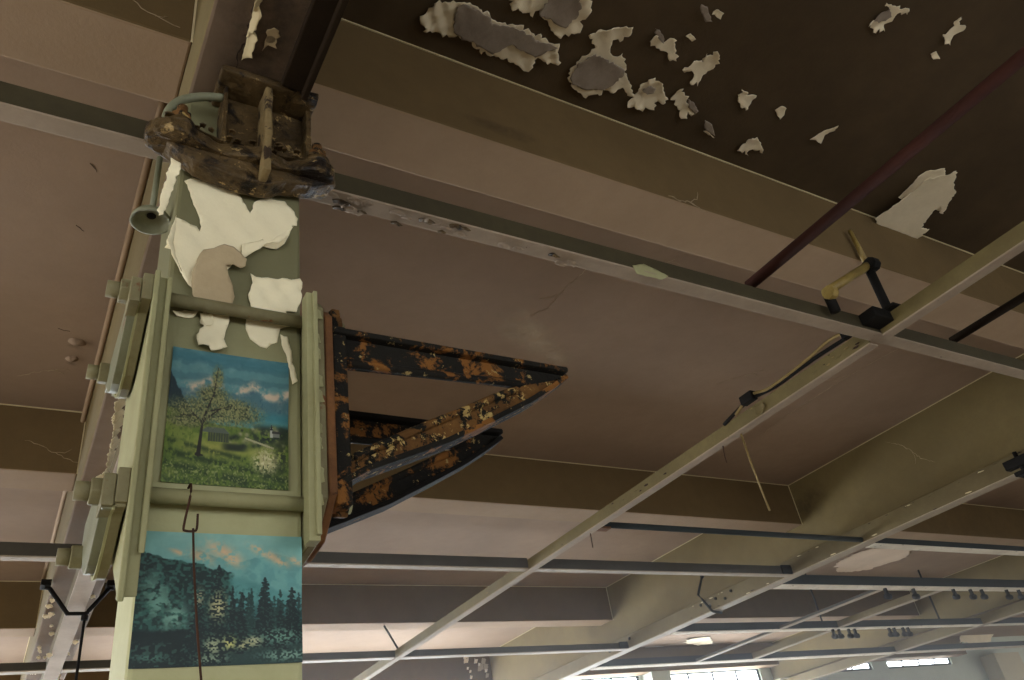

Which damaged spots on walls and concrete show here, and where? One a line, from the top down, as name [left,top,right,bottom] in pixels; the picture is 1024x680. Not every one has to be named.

peeling [700,4,724,22]
peeling [869,3,910,33]
peeling [931,17,966,59]
peeling [420,0,720,138]
peeling [738,90,757,111]
peeling [737,137,763,155]
peeling [810,126,838,144]
peeling [875,168,958,239]
peeling [157,158,302,384]